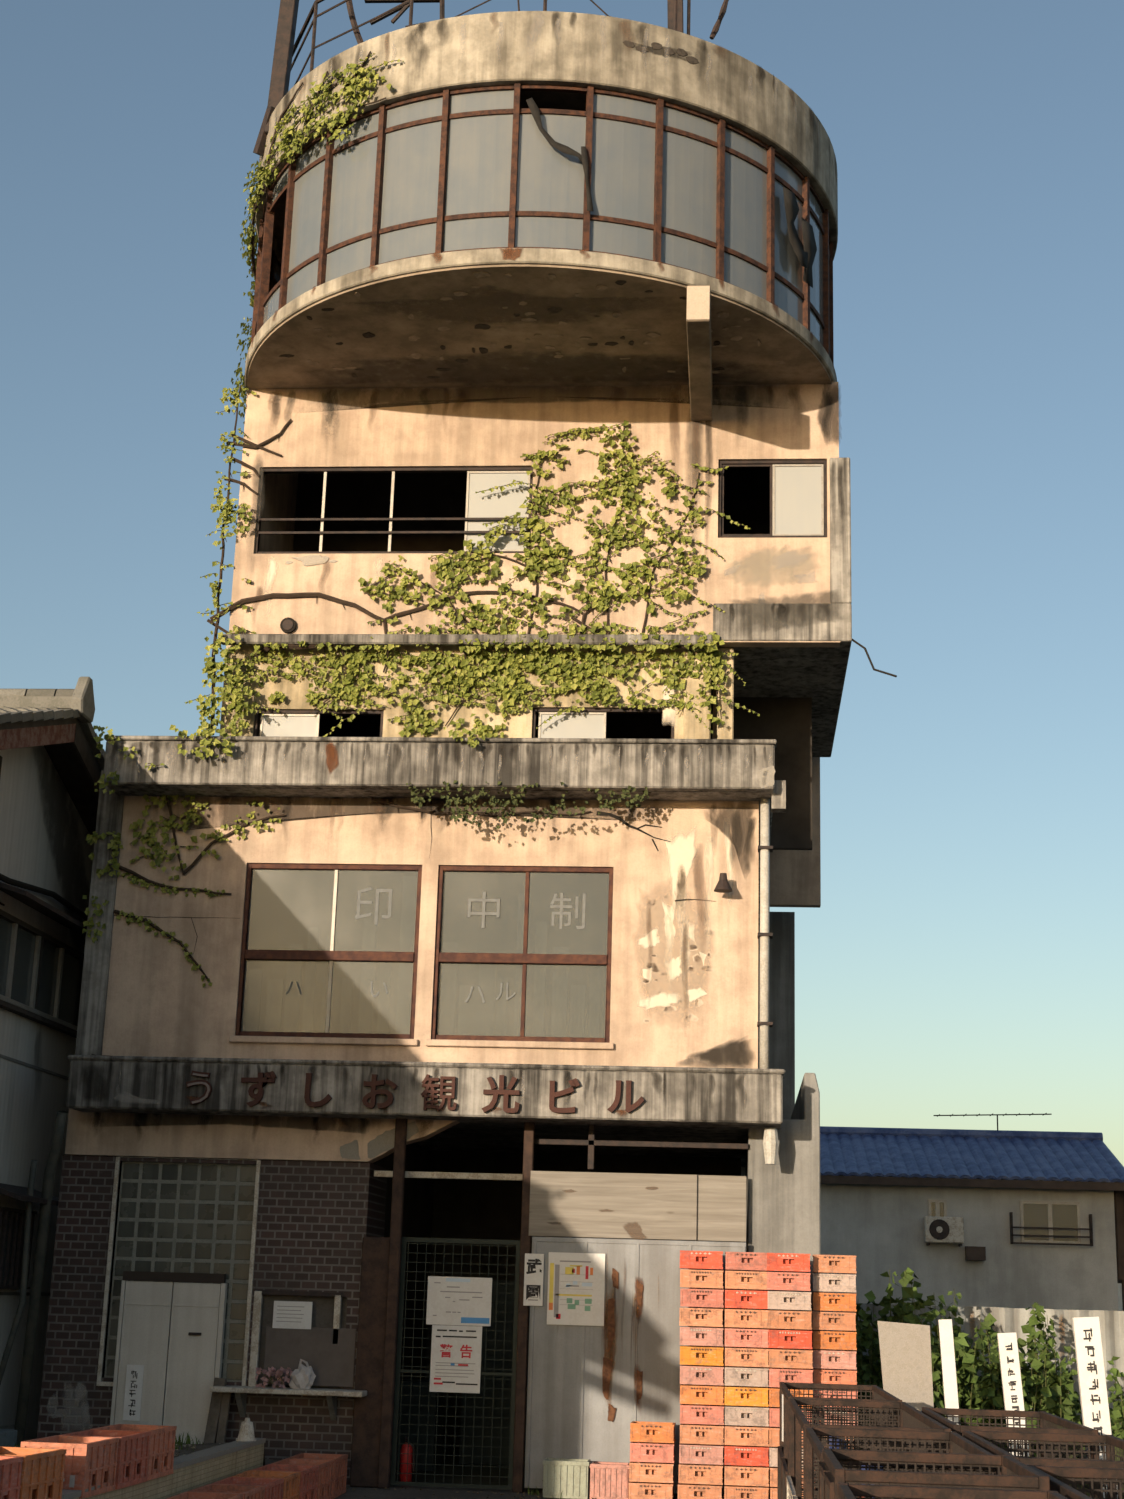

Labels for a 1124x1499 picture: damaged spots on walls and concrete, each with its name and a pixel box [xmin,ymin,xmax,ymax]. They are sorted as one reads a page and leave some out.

leakage [818,390,840,440]
peeling [638,894,716,1023]
leakage [665,804,753,968]
rust [602,1268,643,1422]